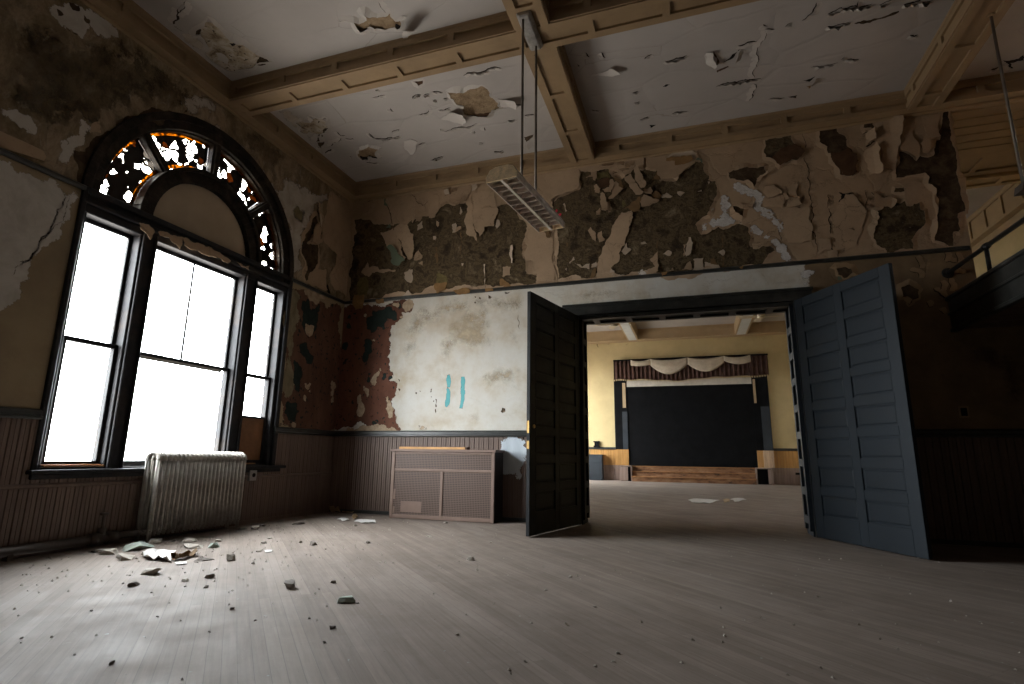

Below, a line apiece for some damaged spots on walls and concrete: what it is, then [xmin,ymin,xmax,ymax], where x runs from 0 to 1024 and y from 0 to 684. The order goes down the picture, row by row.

peeling [338,6,406,35]
leakage [15,25,192,183]
peeling [441,85,517,125]
flaking render [0,160,79,311]
crack [14,191,69,274]
flaking render [263,111,969,431]